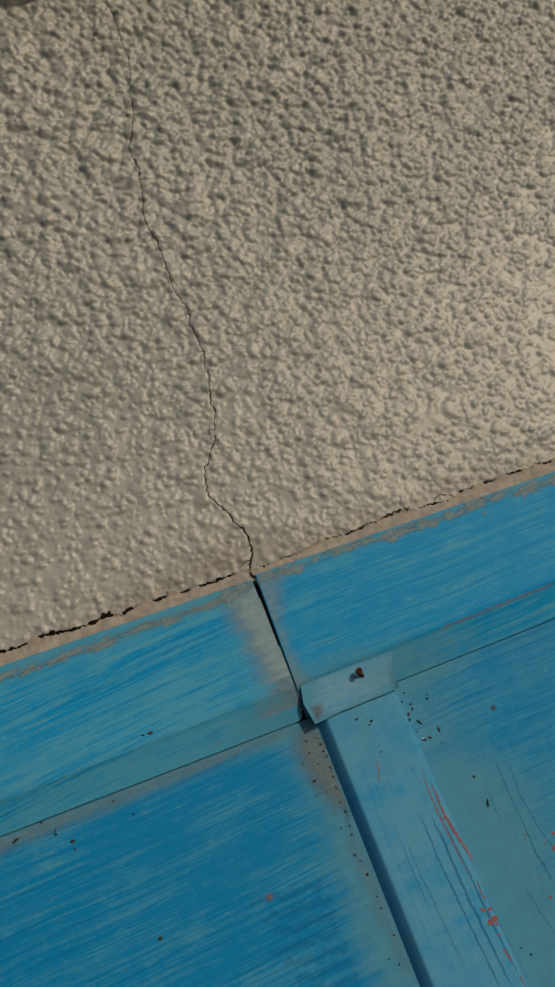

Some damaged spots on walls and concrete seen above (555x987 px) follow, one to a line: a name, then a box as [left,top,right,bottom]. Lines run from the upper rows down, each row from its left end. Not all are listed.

crack [0,2,552,653]